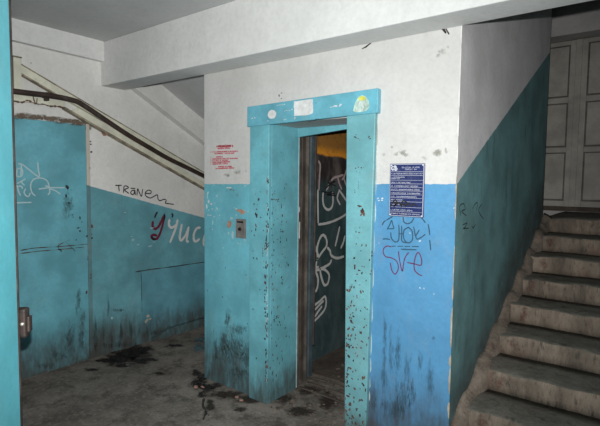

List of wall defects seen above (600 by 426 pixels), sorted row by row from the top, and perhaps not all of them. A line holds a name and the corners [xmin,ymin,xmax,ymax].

flaking render [14,113,91,130]
rust [346,286,369,357]
water stain [86,344,158,371]
water stain [191,369,260,412]
water stain [276,386,336,416]